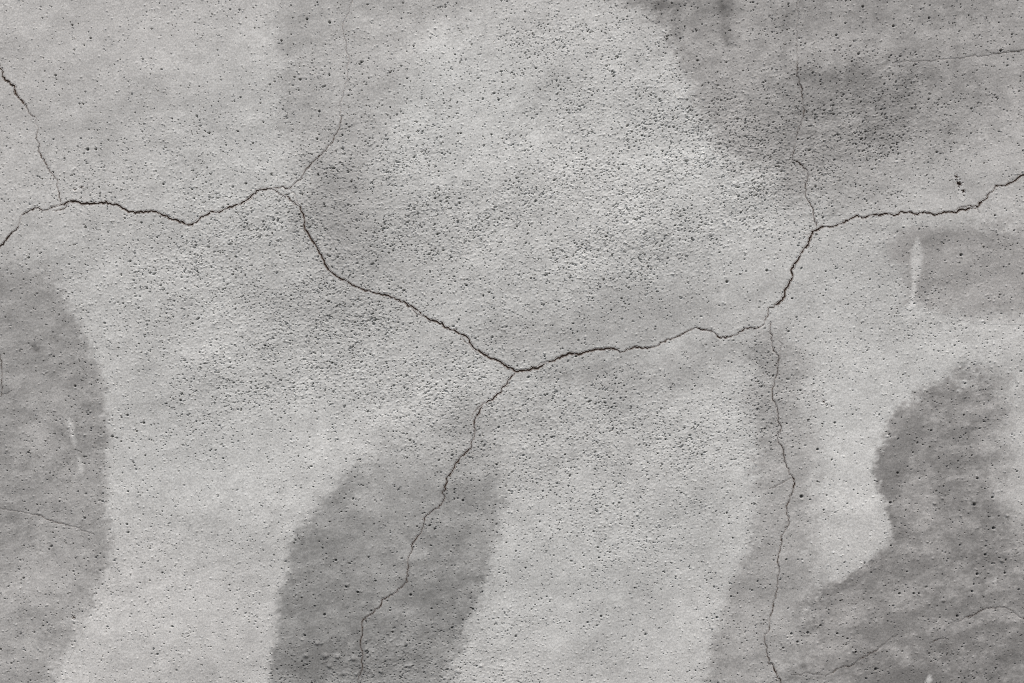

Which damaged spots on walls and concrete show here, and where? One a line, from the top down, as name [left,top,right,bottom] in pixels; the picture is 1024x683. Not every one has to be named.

water stain [0,229,115,683]
crack [0,0,546,683]
water stain [264,401,507,683]
water stain [462,270,1024,683]
crack [764,322,796,683]
crack [537,0,1024,367]
crack [796,635,897,677]
crack [929,606,1024,644]